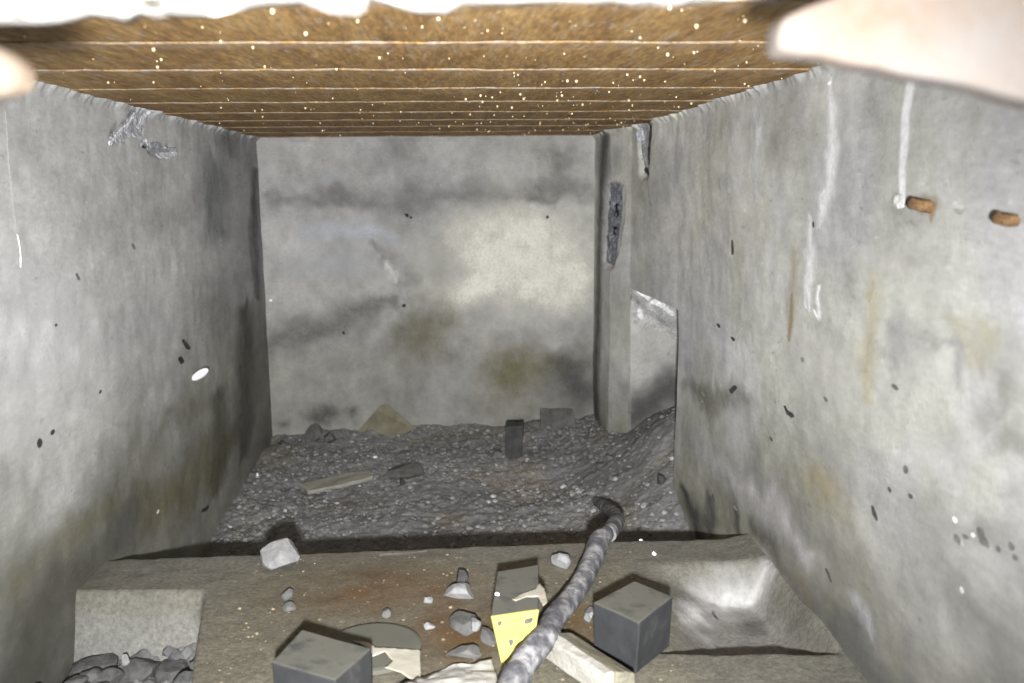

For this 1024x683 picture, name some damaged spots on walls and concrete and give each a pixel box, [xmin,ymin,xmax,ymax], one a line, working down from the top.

spalling [108,107,177,159]
spalling [606,182,623,266]
damp [804,75,837,320]